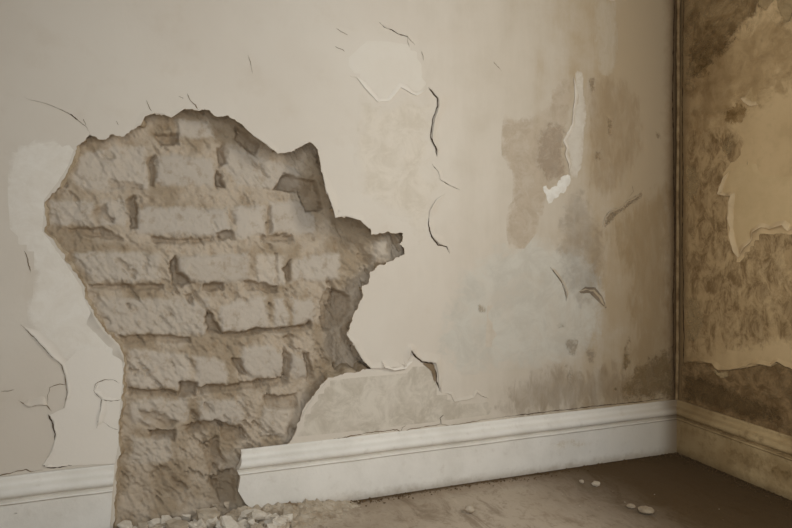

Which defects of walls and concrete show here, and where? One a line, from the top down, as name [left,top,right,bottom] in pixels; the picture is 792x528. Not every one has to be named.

flaking render [8,105,493,528]
crack [337,1,685,439]
leakage [435,78,606,376]
peeling [543,71,587,203]
peeling [681,122,792,436]